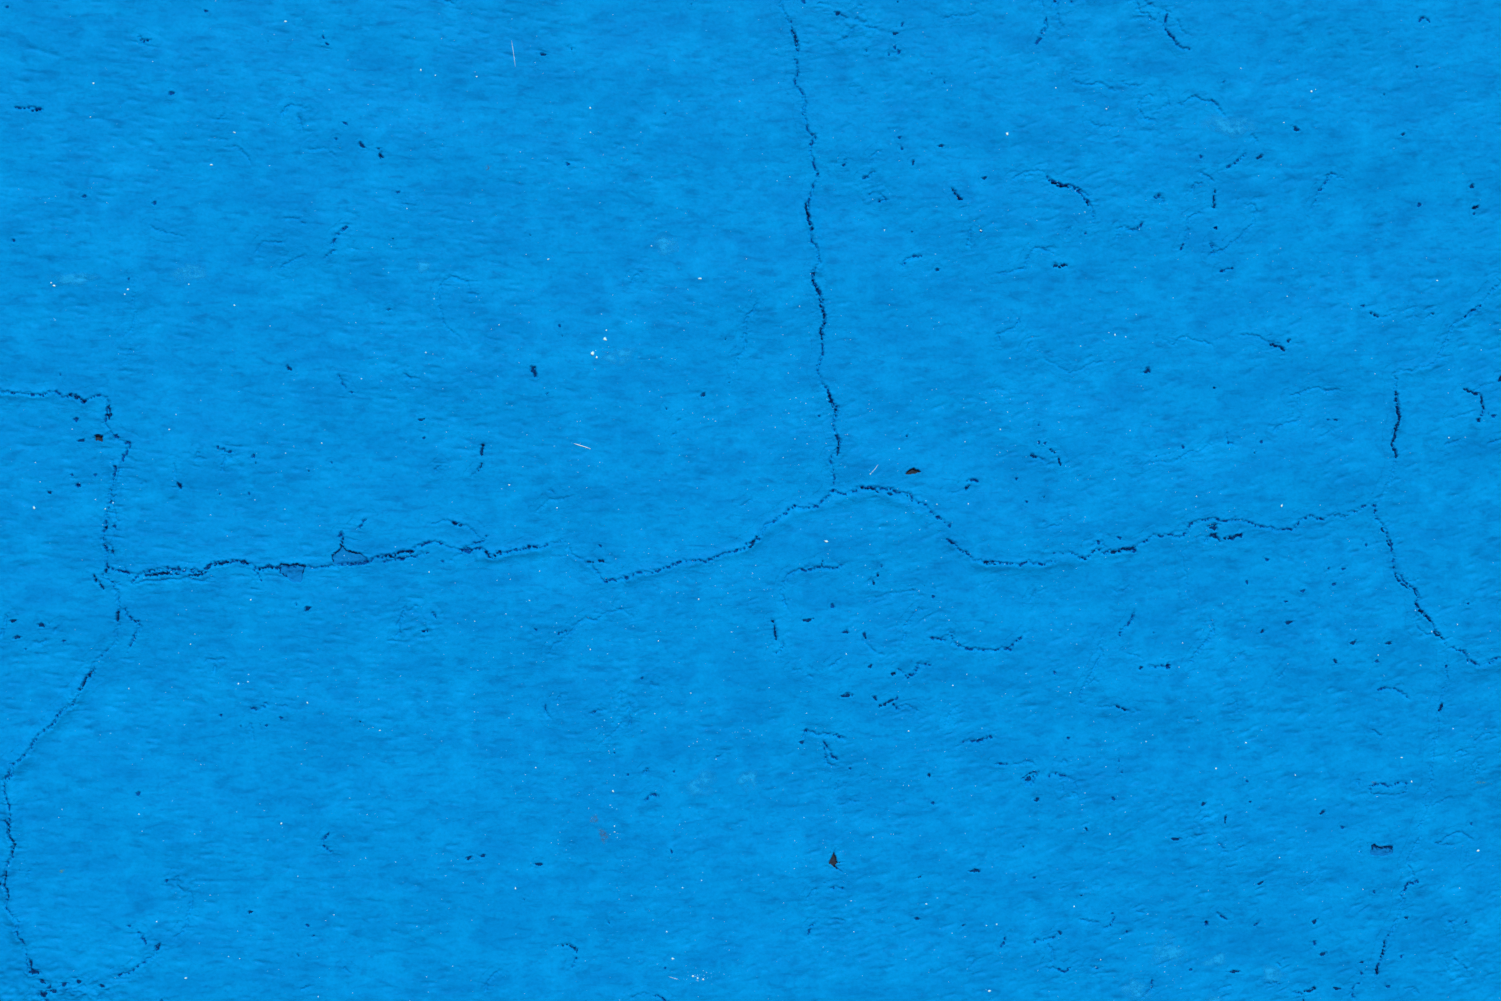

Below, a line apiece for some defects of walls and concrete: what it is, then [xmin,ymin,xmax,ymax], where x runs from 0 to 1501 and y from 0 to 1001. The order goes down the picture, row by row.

crack [809,0,886,50]
crack [1412,9,1438,30]
crack [5,98,53,121]
crack [943,0,1254,283]
crack [861,184,896,211]
crack [316,216,358,268]
crack [770,0,852,490]
crack [894,247,930,276]
crack [0,266,1501,1001]